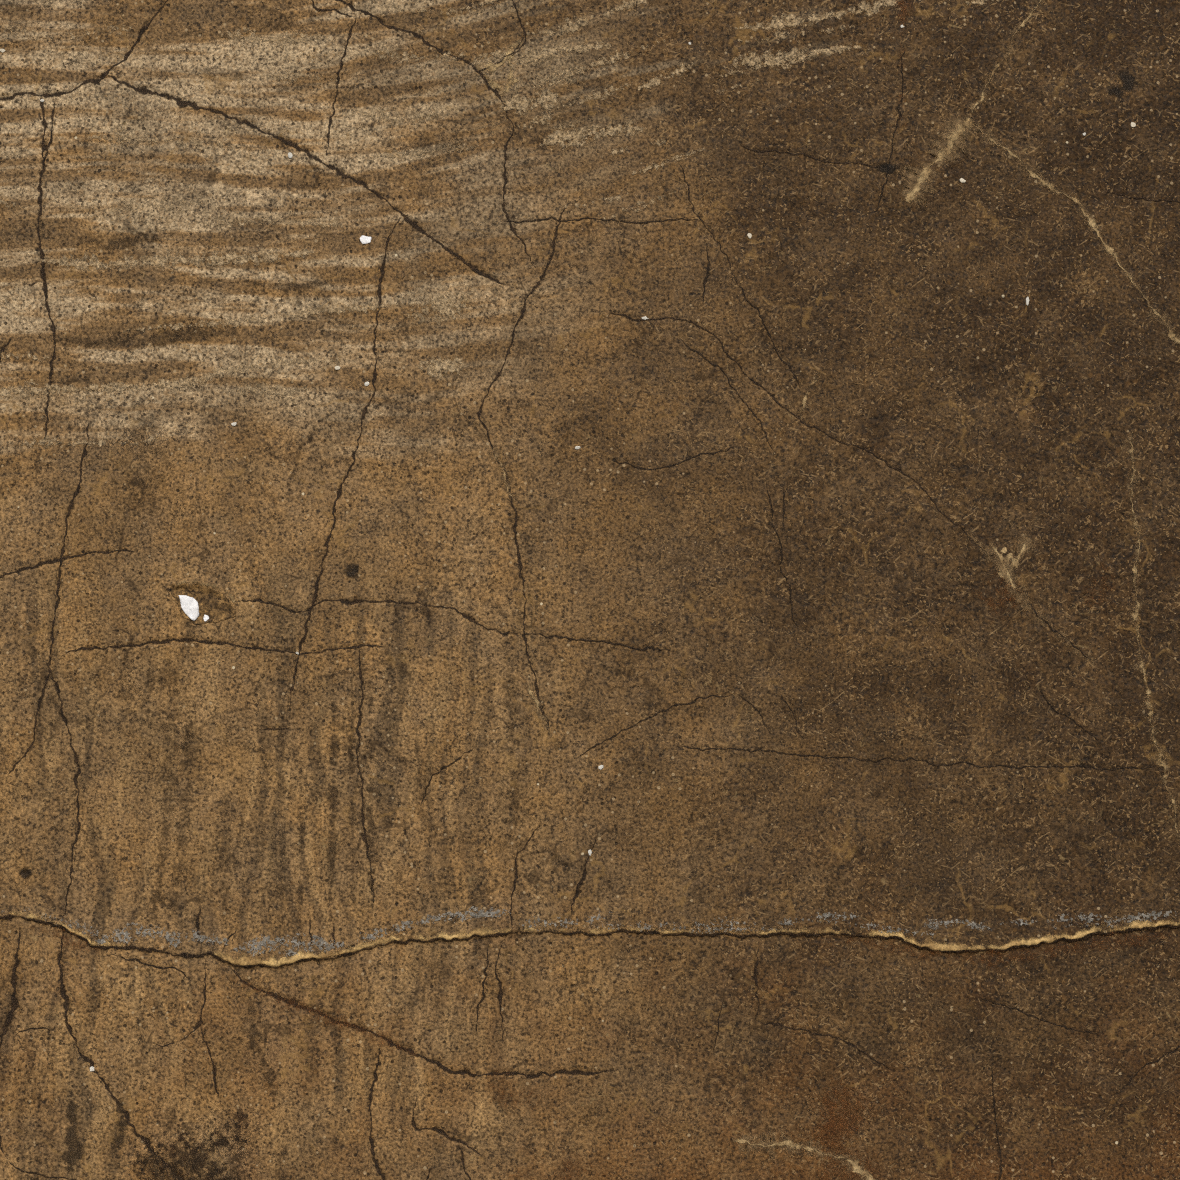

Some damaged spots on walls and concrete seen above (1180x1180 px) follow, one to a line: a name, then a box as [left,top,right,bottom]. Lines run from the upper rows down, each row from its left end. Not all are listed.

crack [0,0,800,1180]